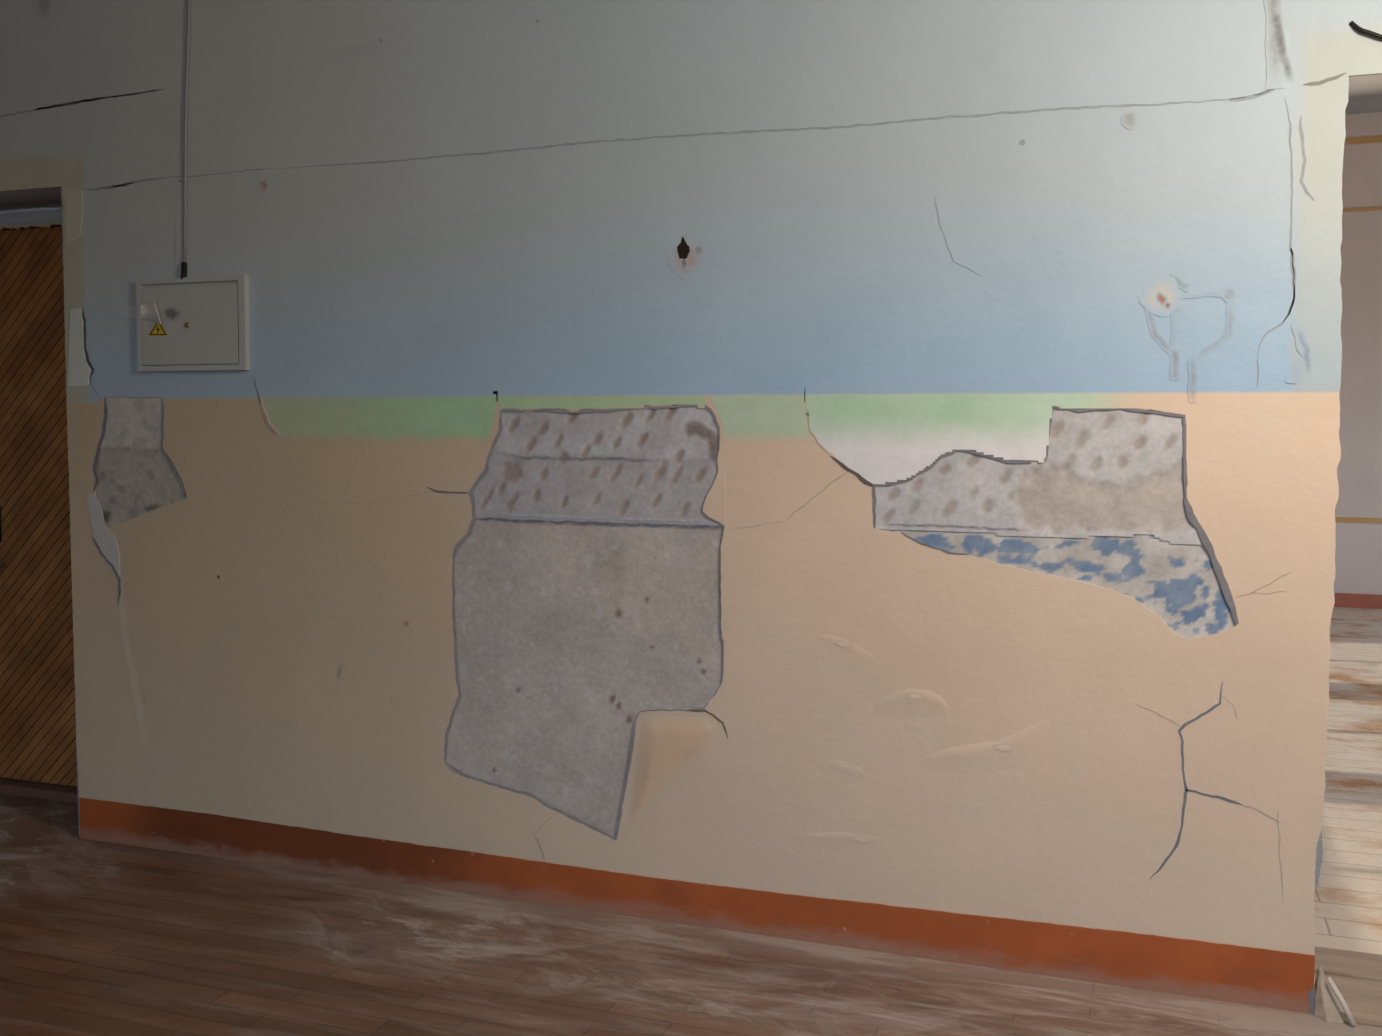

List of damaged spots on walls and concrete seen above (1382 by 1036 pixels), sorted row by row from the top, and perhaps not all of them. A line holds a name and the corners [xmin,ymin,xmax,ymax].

peeling [64,189,83,244]
crack [80,72,1347,389]
spalling [68,308,187,751]
spalling [444,404,728,840]
spalling [804,387,1239,639]
crack [1133,681,1284,904]